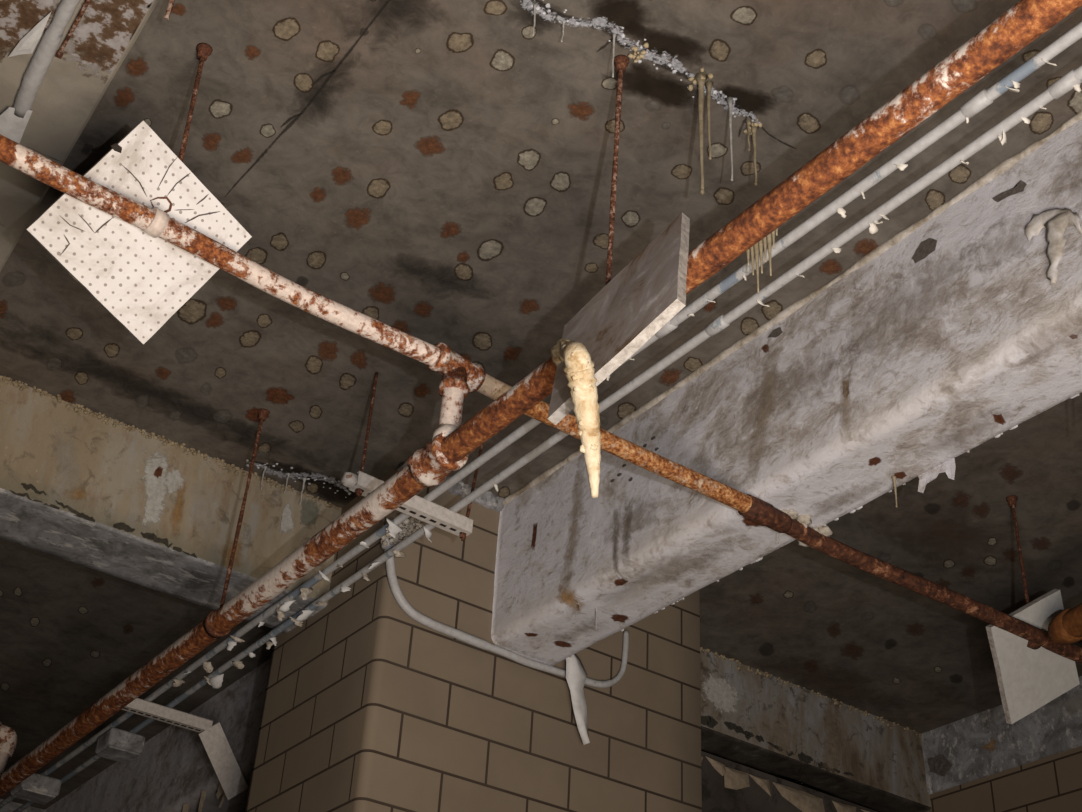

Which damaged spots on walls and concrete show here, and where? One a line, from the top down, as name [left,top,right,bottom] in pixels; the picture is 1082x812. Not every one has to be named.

peeling [0,0,57,60]
peeling [63,0,153,83]
leakage [595,0,704,61]
leakage [615,64,692,106]
leakage [717,87,771,113]
rust [417,136,445,156]
rust [310,167,351,202]
peeling [1025,208,1082,285]
rust [206,296,237,328]
rust [391,301,433,333]
rust [246,387,294,422]
peeling [142,452,185,527]